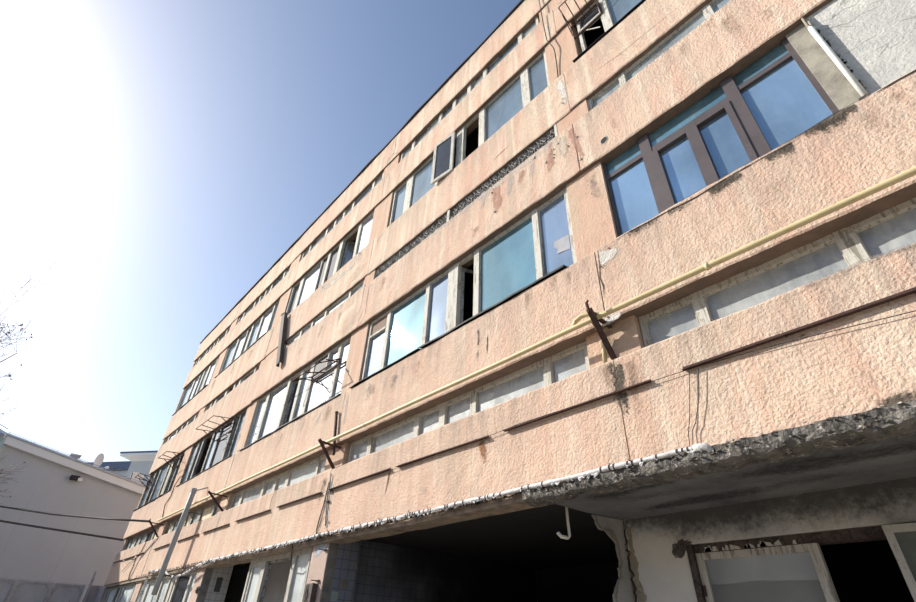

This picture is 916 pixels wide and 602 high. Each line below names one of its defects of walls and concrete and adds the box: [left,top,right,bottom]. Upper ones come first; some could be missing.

spalling [522,400,916,507]